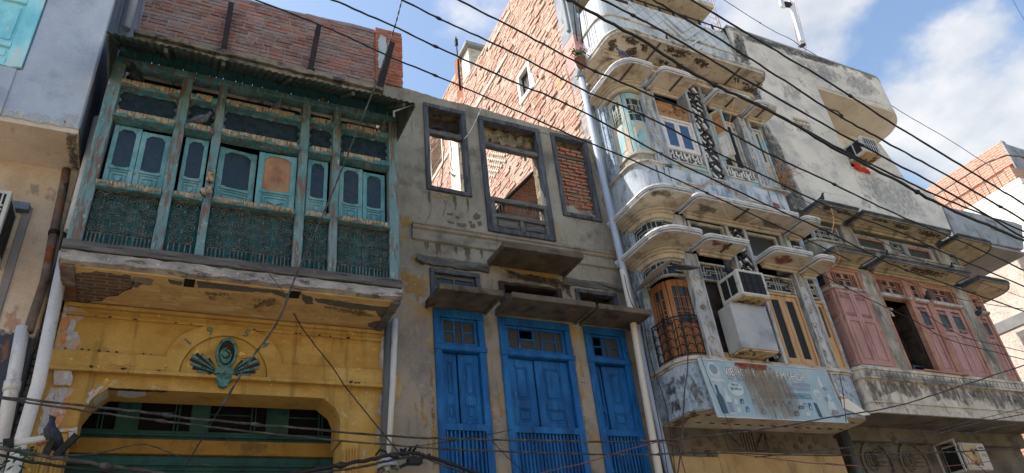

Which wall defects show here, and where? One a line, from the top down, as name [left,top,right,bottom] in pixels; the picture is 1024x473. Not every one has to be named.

damp [734,33,836,66]
damp [761,125,805,213]
spalling [56,271,154,353]
peeling [37,370,77,437]
damp [666,374,702,426]
damp [865,370,1024,408]